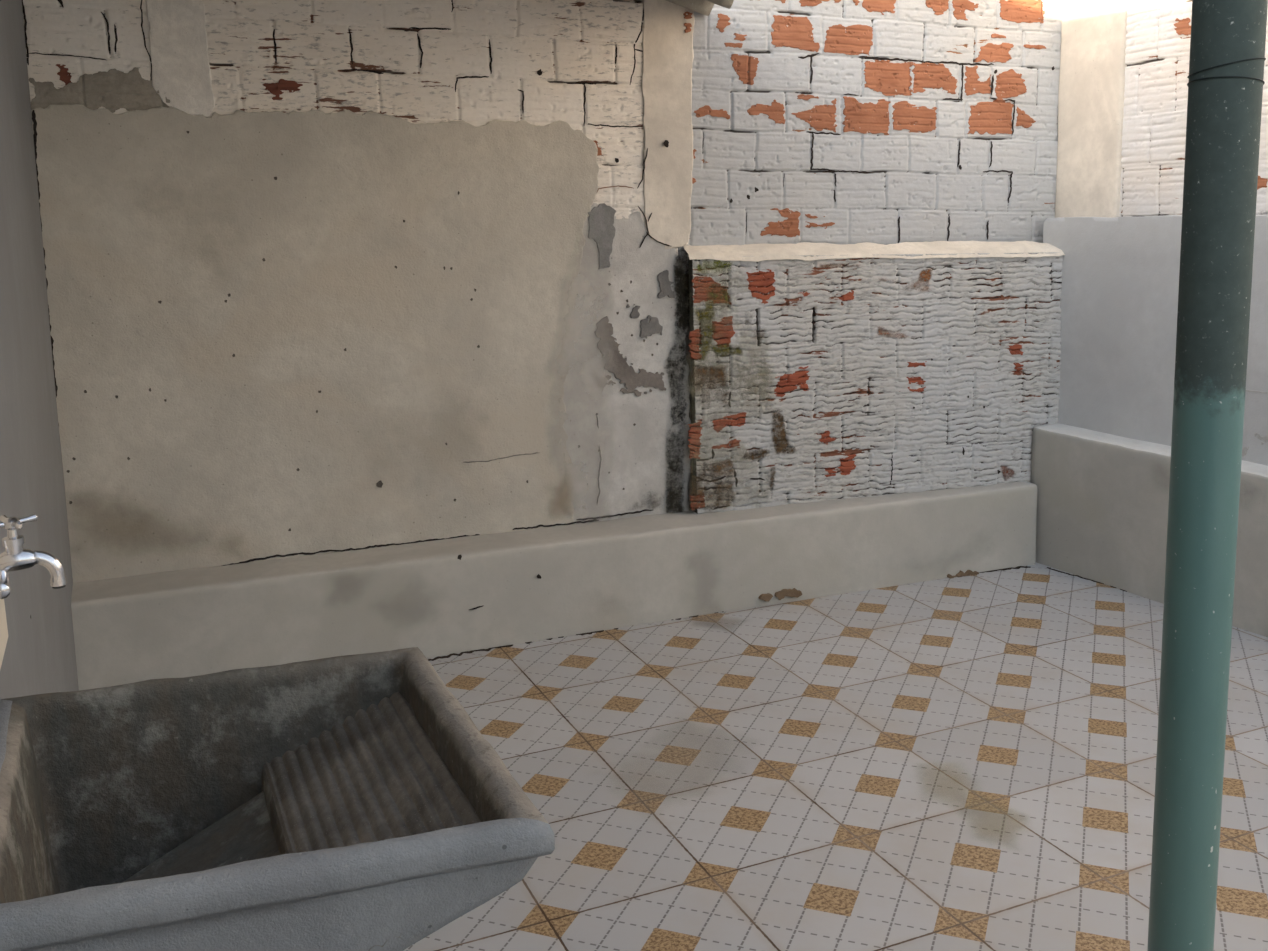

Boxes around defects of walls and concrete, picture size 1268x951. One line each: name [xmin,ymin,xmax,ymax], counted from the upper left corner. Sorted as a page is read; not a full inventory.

crack [630,9,644,84]
peeling [716,13,759,85]
peeling [747,0,1046,135]
peeling [1174,18,1191,38]
crack [588,123,670,248]
spalling [588,203,616,269]
peeling [760,208,835,237]
peeling [746,269,776,304]
spalling [592,281,666,397]
water stain [650,250,776,513]
peeling [774,366,810,399]
peeling [687,412,747,459]